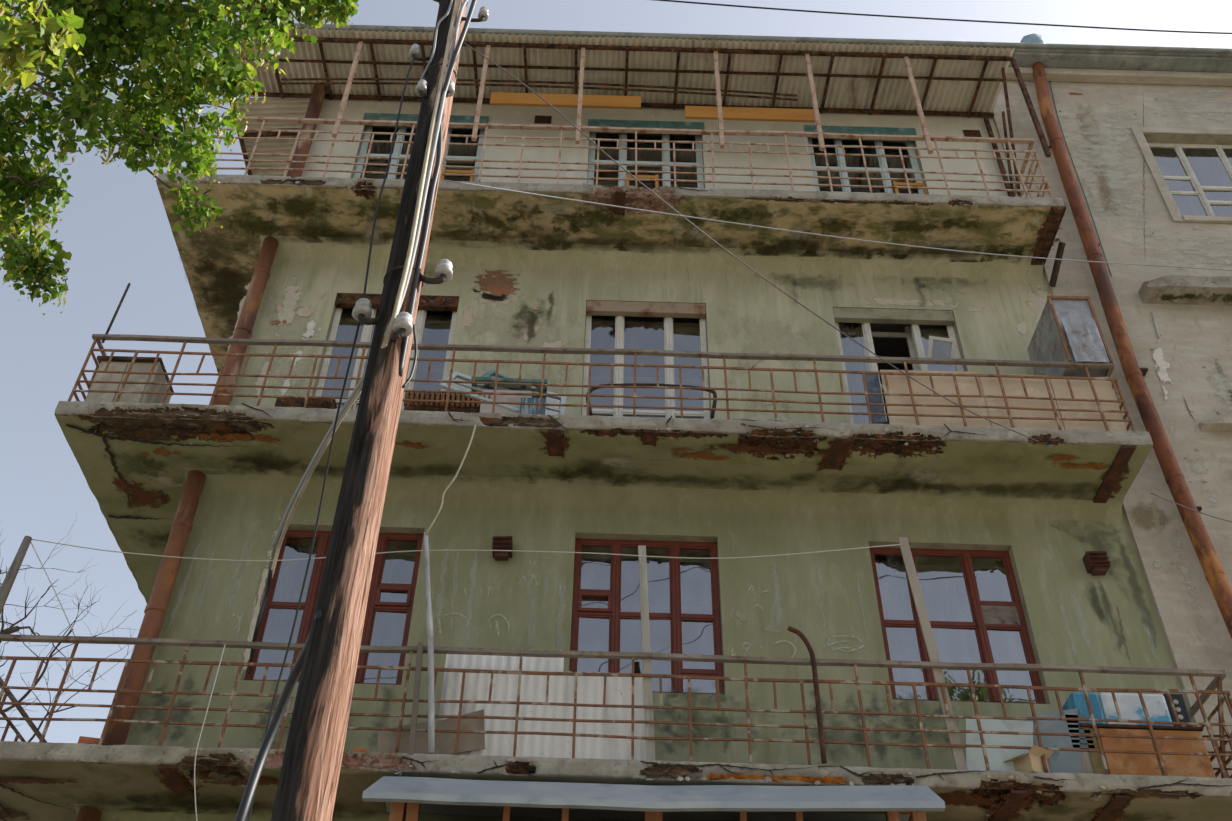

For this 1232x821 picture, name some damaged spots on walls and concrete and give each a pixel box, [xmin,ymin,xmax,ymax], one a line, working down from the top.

water stain [306,224,393,245]
water stain [539,227,676,251]
water stain [839,240,980,258]
peeling [254,276,321,398]
peeling [462,270,566,428]
spalling [76,402,274,445]
spalling [580,424,827,464]
spalling [849,428,946,463]
rust [112,477,170,511]
rust [1045,455,1131,498]
spalling [177,747,285,788]
spalling [959,774,1066,816]